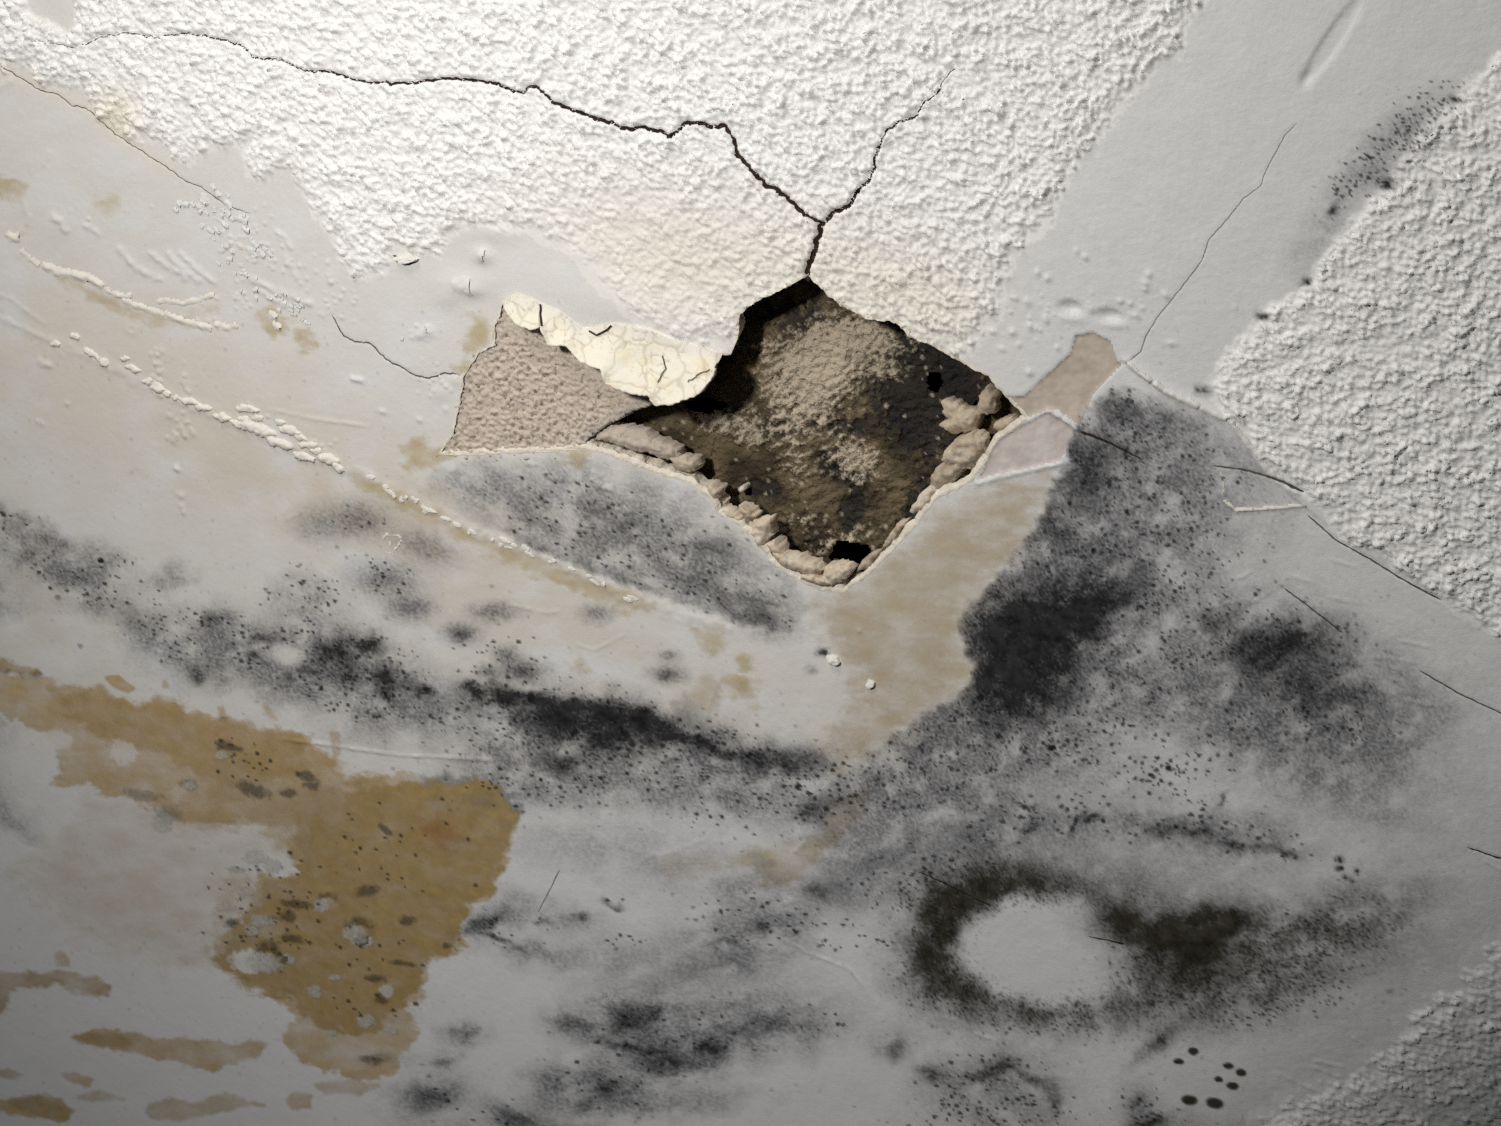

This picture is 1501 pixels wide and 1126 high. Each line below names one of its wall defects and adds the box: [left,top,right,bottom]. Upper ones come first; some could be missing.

crack [0,66,251,214]
crack [39,32,954,281]
spalling [435,273,1121,593]
damp [0,389,1407,1093]
damp [0,1099,70,1122]
damp [543,1003,819,1109]
damp [923,1054,1074,1126]
damp [1121,1096,1162,1126]
damp [1182,1063,1246,1108]